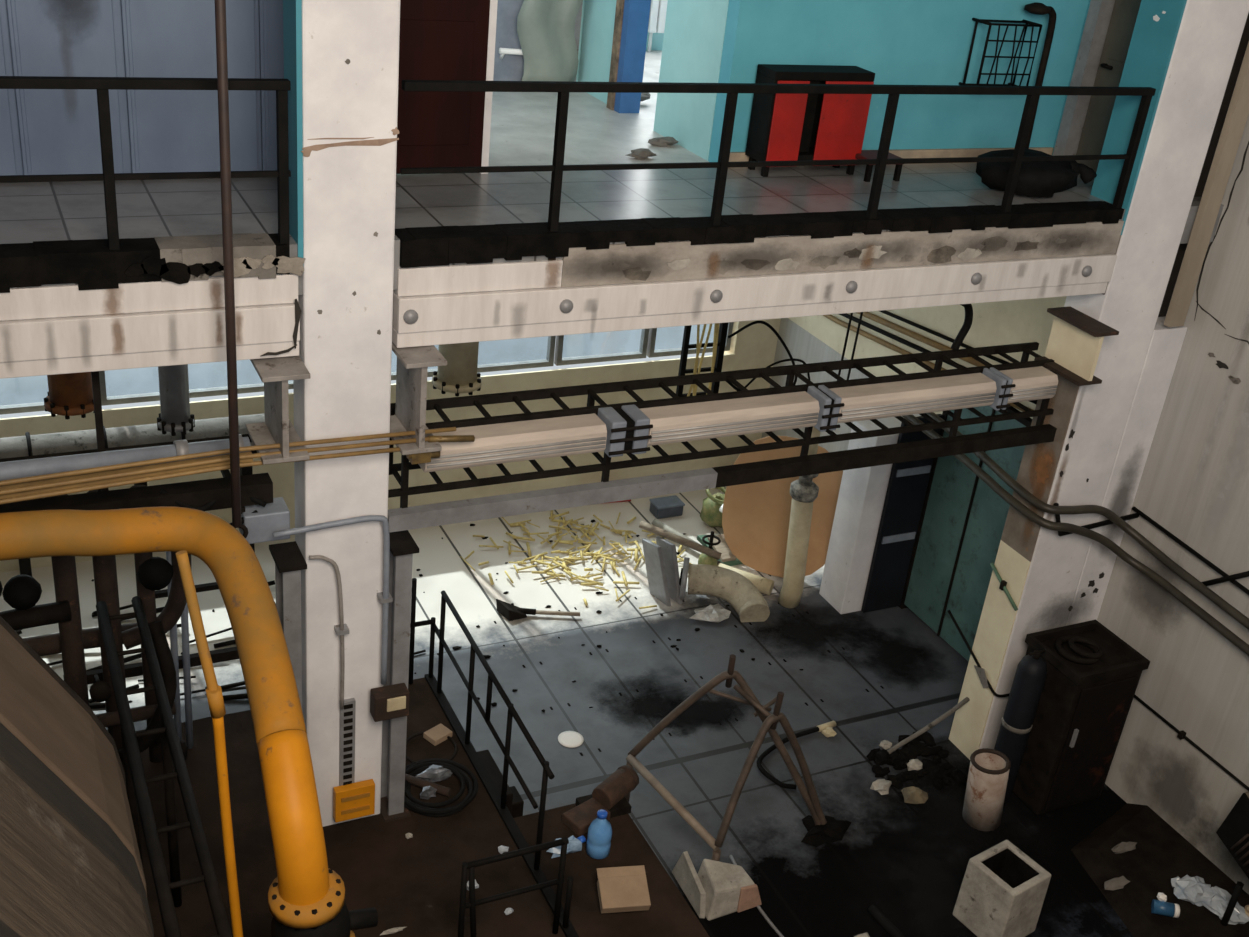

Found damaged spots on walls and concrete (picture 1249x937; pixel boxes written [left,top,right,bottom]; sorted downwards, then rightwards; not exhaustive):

spalling [124,255,306,284]
crack [1194,142,1249,344]
crack [260,299,302,357]